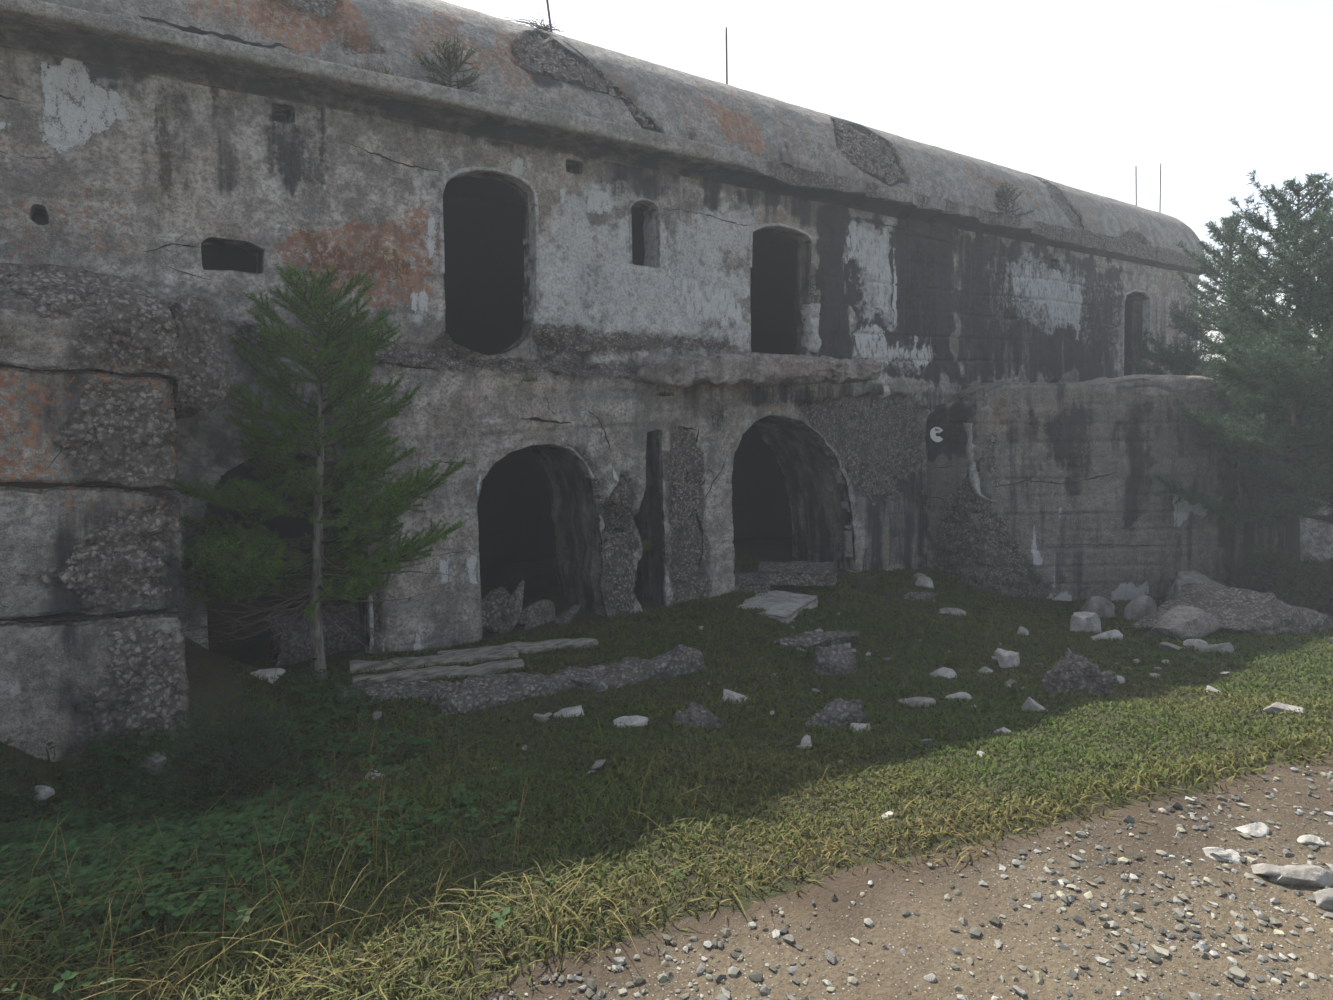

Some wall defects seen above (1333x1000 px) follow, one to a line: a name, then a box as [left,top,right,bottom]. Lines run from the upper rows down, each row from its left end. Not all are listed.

crack [137,14,291,49]
peeling [34,56,130,155]
leakage [155,80,189,197]
leakage [266,106,328,196]
spalling [512,32,654,129]
spalling [833,120,903,185]
corrosion [295,221,415,289]
leakage [892,223,937,366]
leakage [956,230,1029,361]